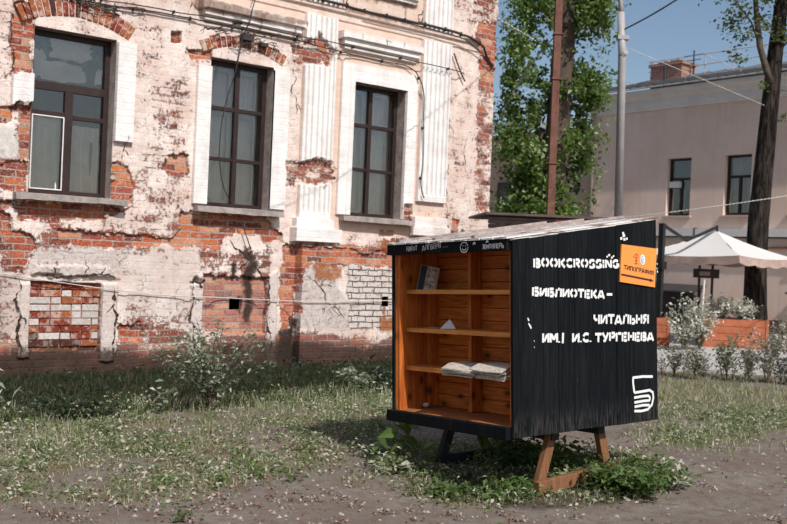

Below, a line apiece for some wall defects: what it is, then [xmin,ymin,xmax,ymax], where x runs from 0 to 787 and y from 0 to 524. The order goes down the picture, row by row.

spalling [9,1,35,74]
spalling [171,31,181,44]
spalling [185,45,213,61]
spalling [472,0,499,214]
spalling [0,101,392,335]
crack [12,281,27,354]
spalling [28,281,101,352]
crack [41,260,121,359]
spalling [115,321,145,345]
crack [170,278,206,350]